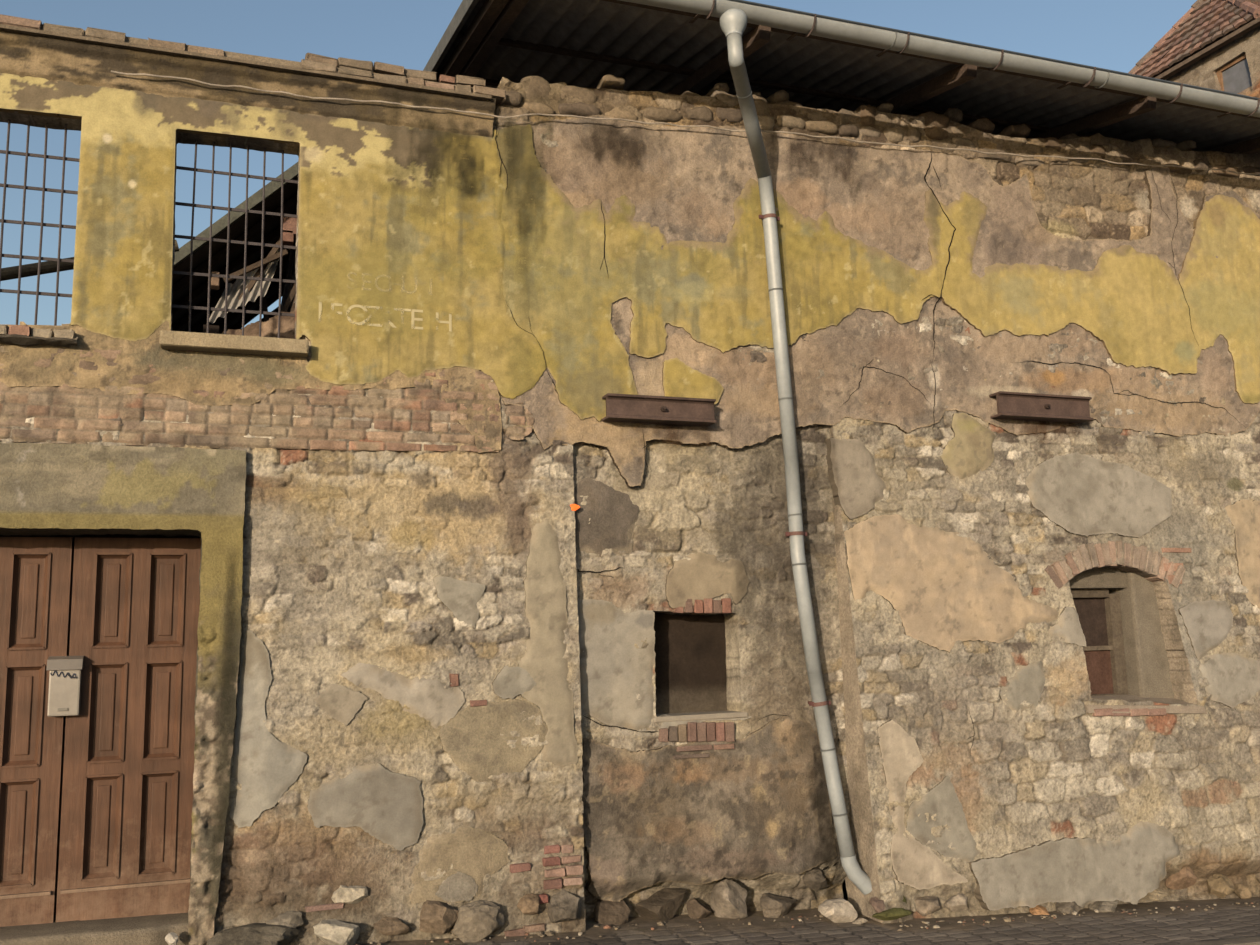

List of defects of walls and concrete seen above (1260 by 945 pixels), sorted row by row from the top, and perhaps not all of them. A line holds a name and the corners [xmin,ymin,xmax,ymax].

flaking render [511,114,1260,279]
crack [840,149,956,427]
crack [1151,170,1194,334]
flaking render [0,297,1260,487]
flaking render [510,844,583,904]